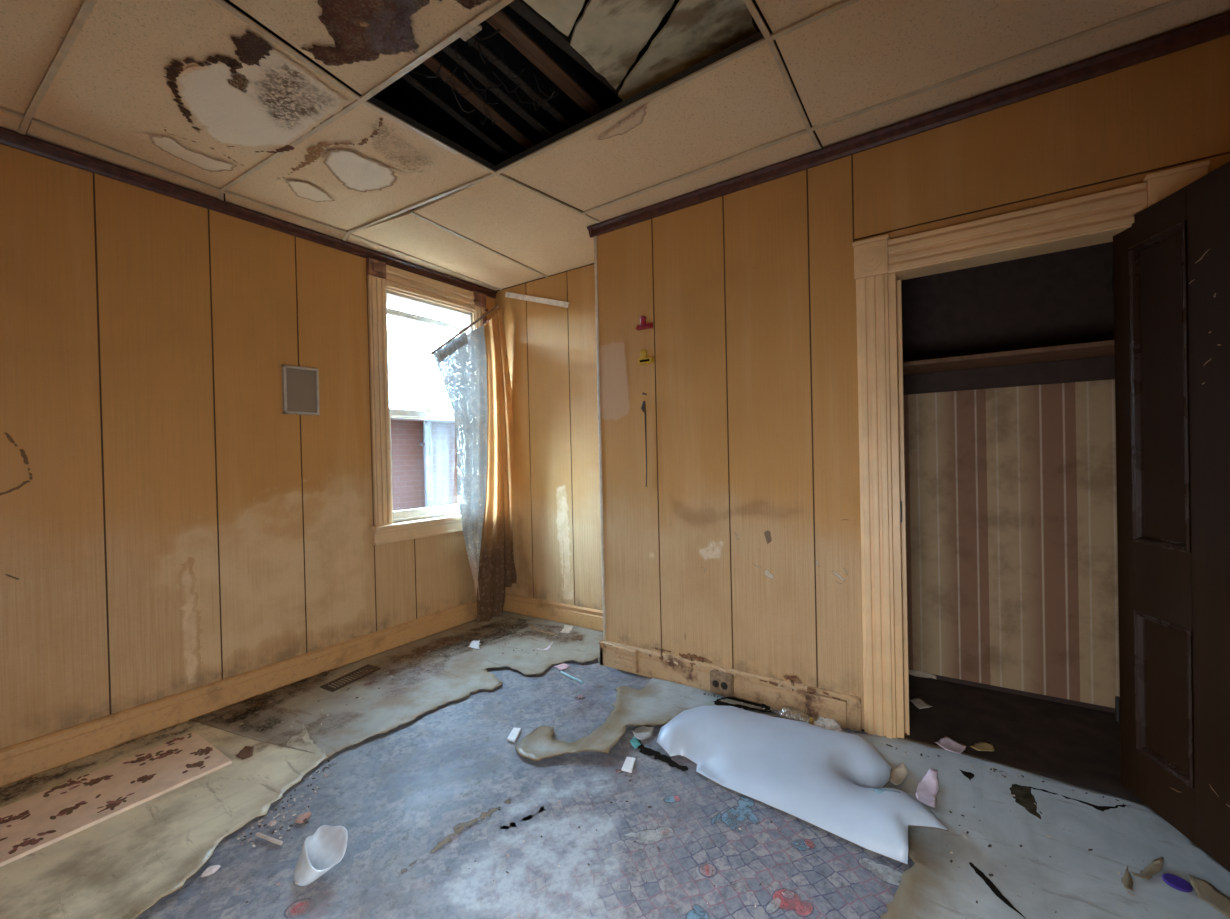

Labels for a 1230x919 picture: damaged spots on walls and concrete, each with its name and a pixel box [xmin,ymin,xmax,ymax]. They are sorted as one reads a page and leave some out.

water stain [149,0,488,203]
crack [0,433,32,495]
water stain [135,467,376,692]